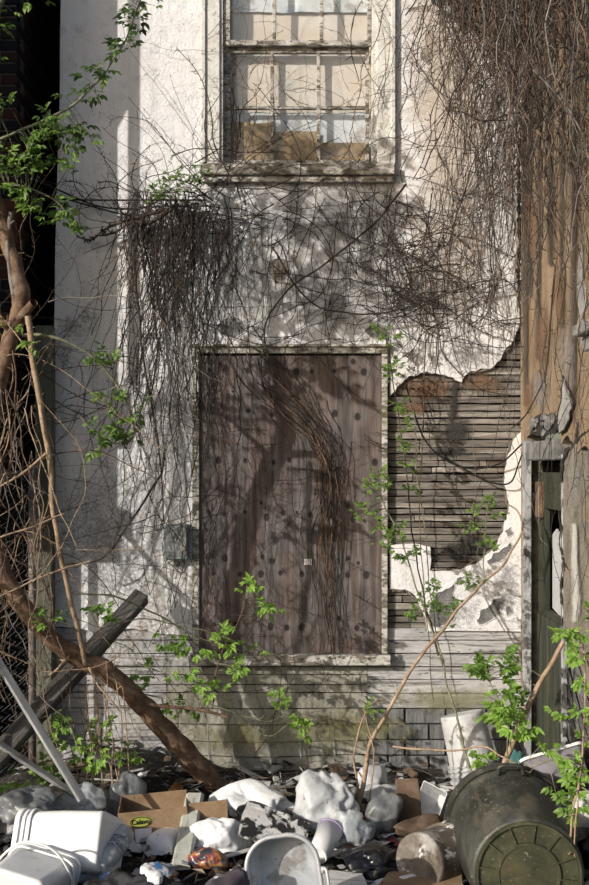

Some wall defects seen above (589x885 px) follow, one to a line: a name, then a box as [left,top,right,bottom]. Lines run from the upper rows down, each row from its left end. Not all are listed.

spalling [267,258,291,283]
spalling [215,317,247,339]
spalling [364,324,389,338]
spalling [388,325,574,631]